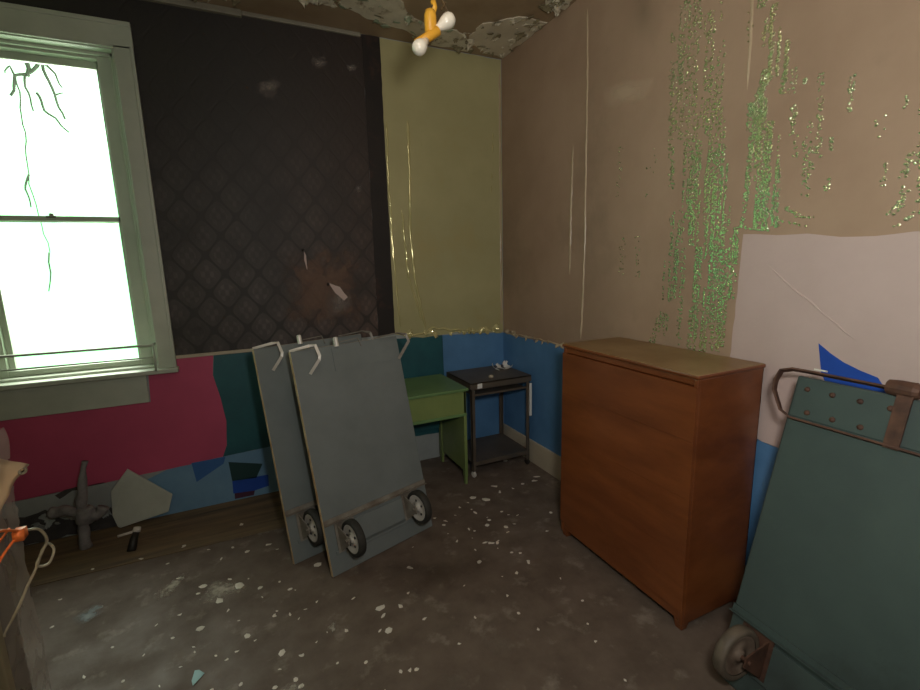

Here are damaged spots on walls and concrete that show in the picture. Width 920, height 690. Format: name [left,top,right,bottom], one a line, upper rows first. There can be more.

peeling [298,0,425,38]
peeling [431,0,572,58]
peeling [403,323,564,349]
flaking render [730,231,920,448]